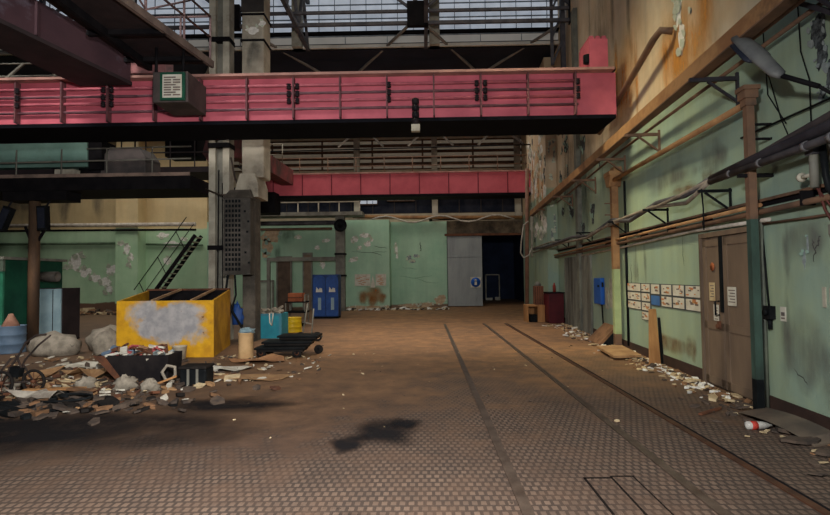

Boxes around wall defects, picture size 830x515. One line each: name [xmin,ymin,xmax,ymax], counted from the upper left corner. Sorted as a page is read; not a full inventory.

flaking render [806,11,830,102]
peeling [63,250,115,295]